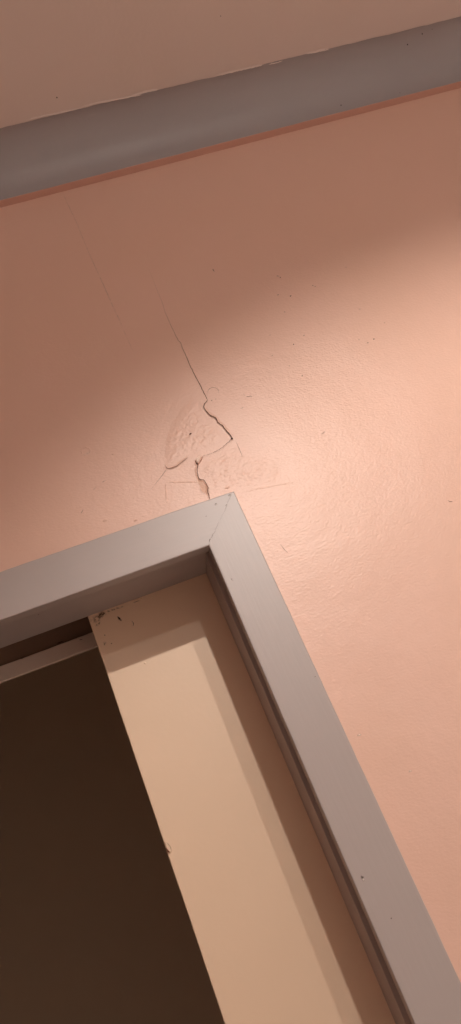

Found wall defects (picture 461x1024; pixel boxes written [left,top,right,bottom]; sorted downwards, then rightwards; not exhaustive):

crack [163,324,234,500]